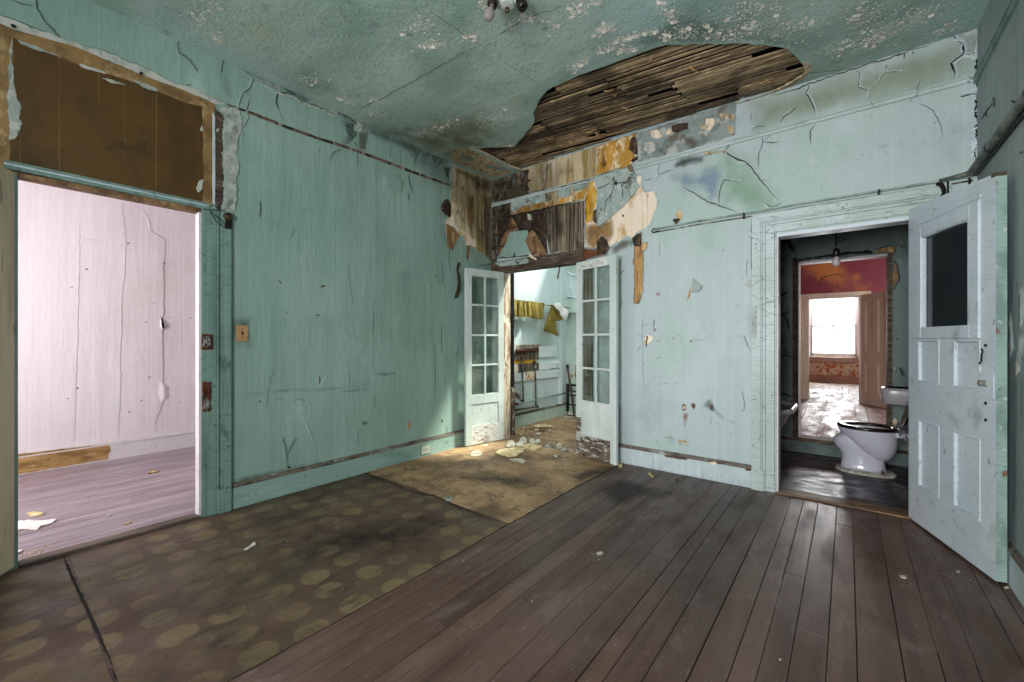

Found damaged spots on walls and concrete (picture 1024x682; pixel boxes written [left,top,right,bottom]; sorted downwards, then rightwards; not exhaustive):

spalling [0,14,244,214]
crack [177,0,574,169]
peeling [396,10,484,56]
peeling [503,0,604,41]
spalling [441,101,739,304]
crack [499,30,993,297]
crack [118,203,167,435]